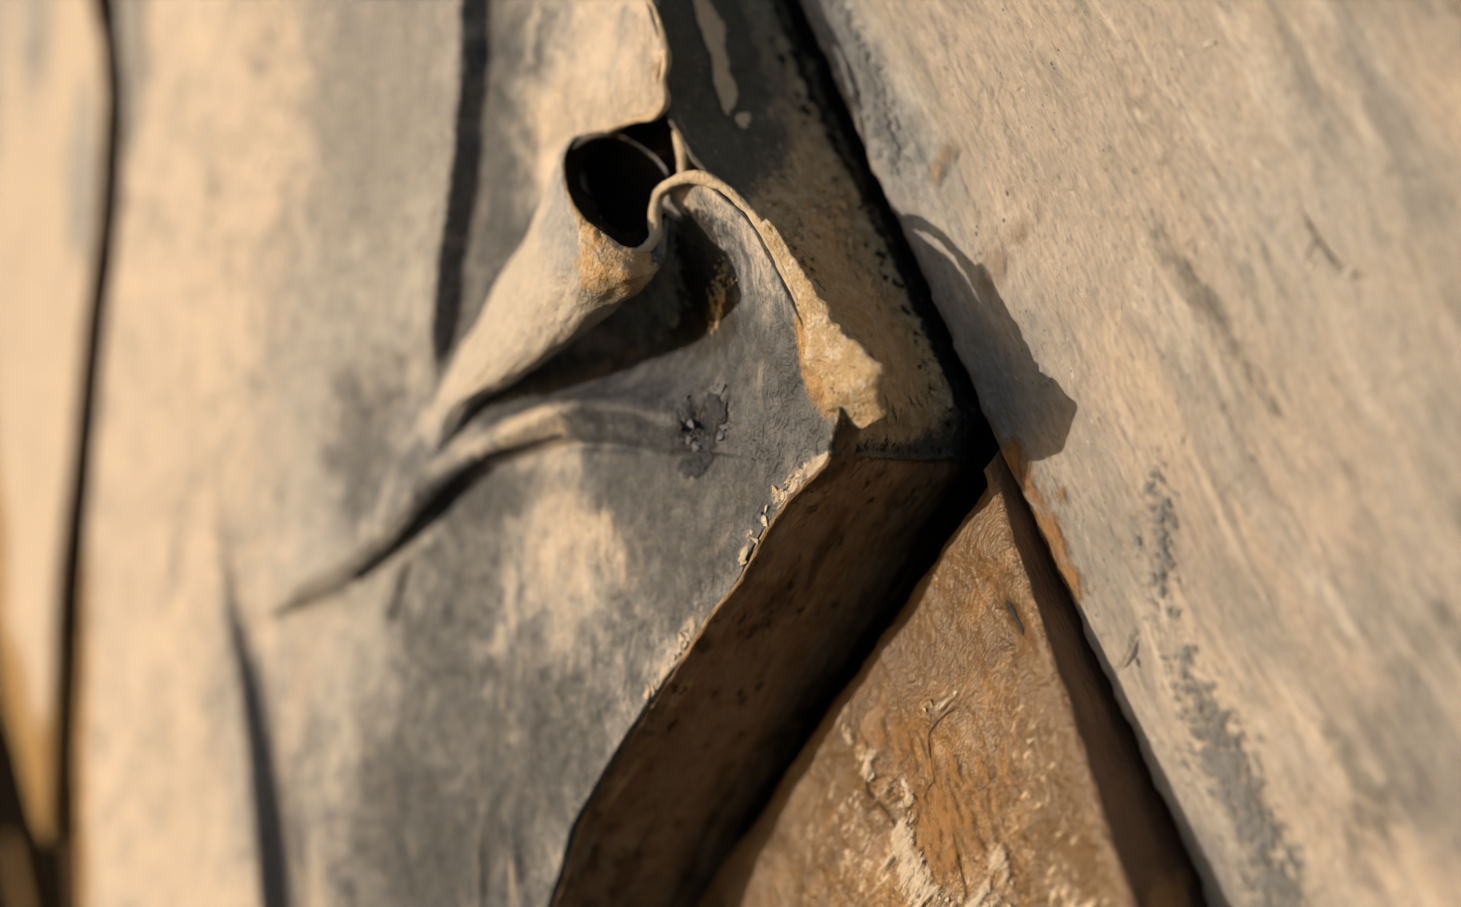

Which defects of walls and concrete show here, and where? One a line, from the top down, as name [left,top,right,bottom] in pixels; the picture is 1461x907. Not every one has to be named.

peeling [694,0,751,128]
peeling [703,251,739,334]
peeling [767,172,956,427]
peeling [497,406,558,441]
spalling [675,380,731,480]
peeling [545,494,625,585]
peeling [738,427,846,566]
rust [1003,437,1086,601]
peeling [642,616,695,703]
crack [863,703,968,903]